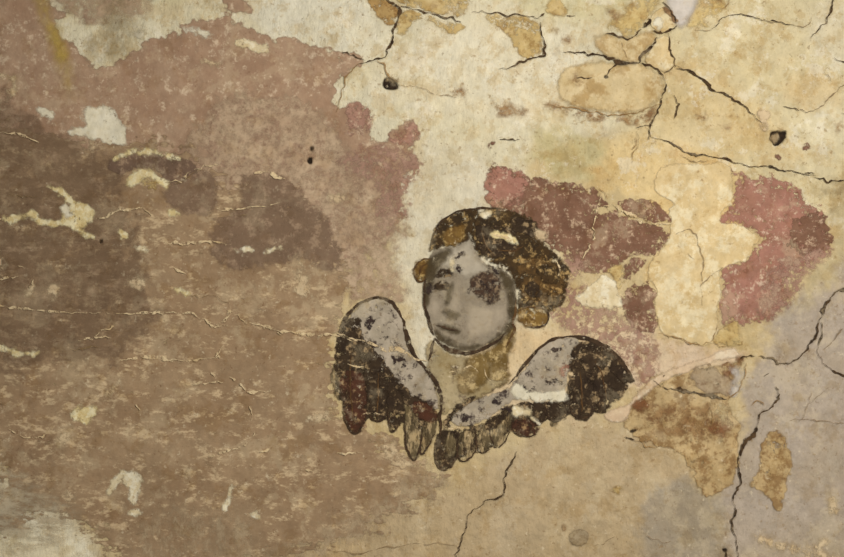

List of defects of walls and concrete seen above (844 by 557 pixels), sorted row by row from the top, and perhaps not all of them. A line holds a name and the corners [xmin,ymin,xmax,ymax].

peeling [368,0,470,35]
crack [337,0,547,110]
peeling [486,13,542,58]
crack [544,0,844,183]
peeling [2,186,95,239]
peeling [127,169,169,190]
peeling [484,166,530,208]
crack [583,188,723,286]
crack [329,452,517,557]
spalling [624,358,743,497]
crack [653,288,844,557]
peeling [750,430,793,511]